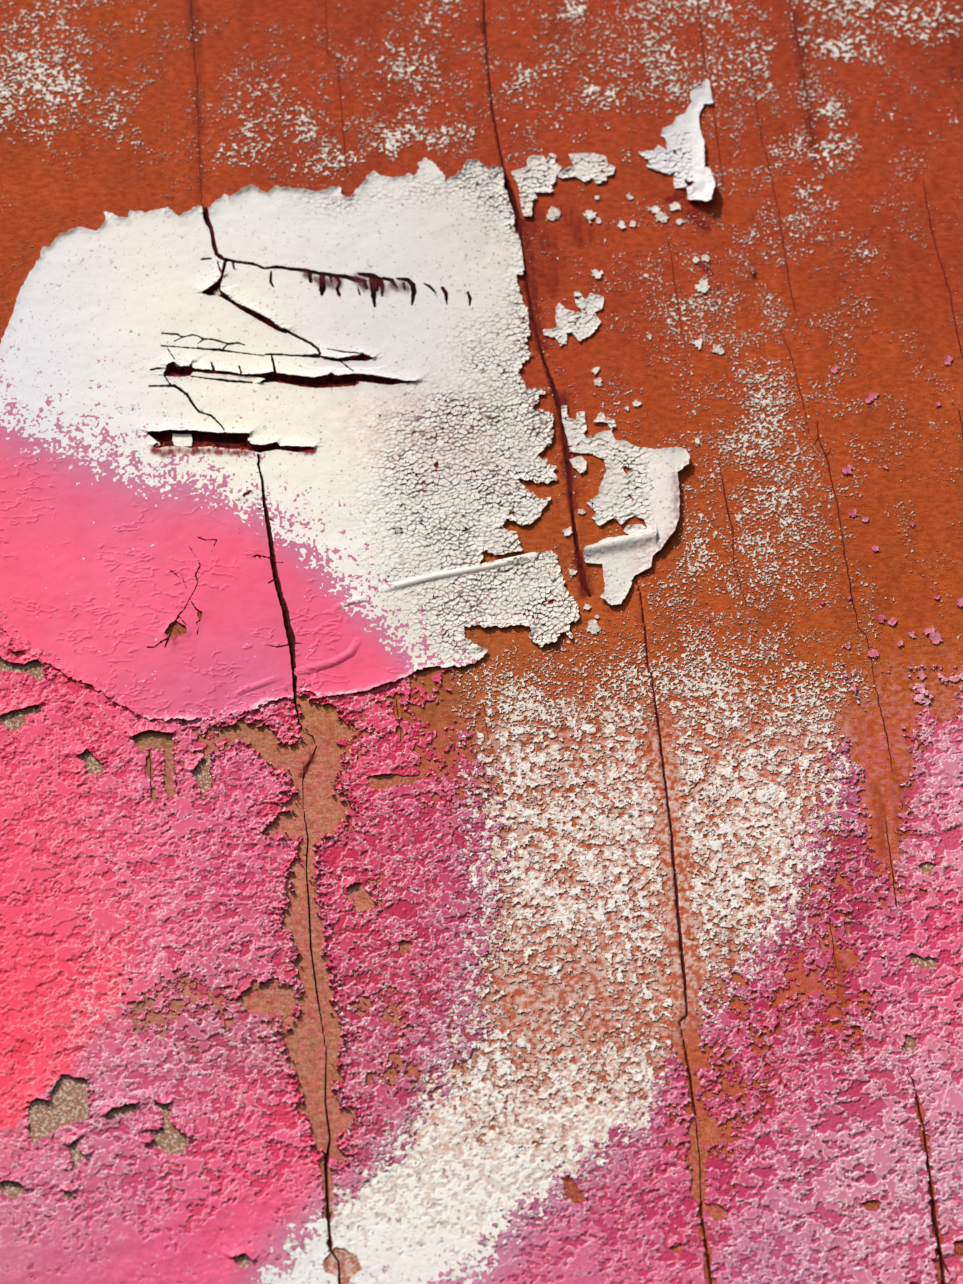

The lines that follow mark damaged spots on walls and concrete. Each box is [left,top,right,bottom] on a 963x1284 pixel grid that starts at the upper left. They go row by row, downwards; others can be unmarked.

rust [303,270,408,292]
rust [515,220,546,348]
crack [483,0,591,596]
rust [151,446,249,456]
rust [555,397,577,506]
peeling [0,705,41,732]
peeling [132,730,177,798]
crack [253,455,341,1284]
crack [634,576,712,1284]
peeling [27,1074,137,1172]
peeling [147,1101,189,1156]
crack [907,1068,950,1284]